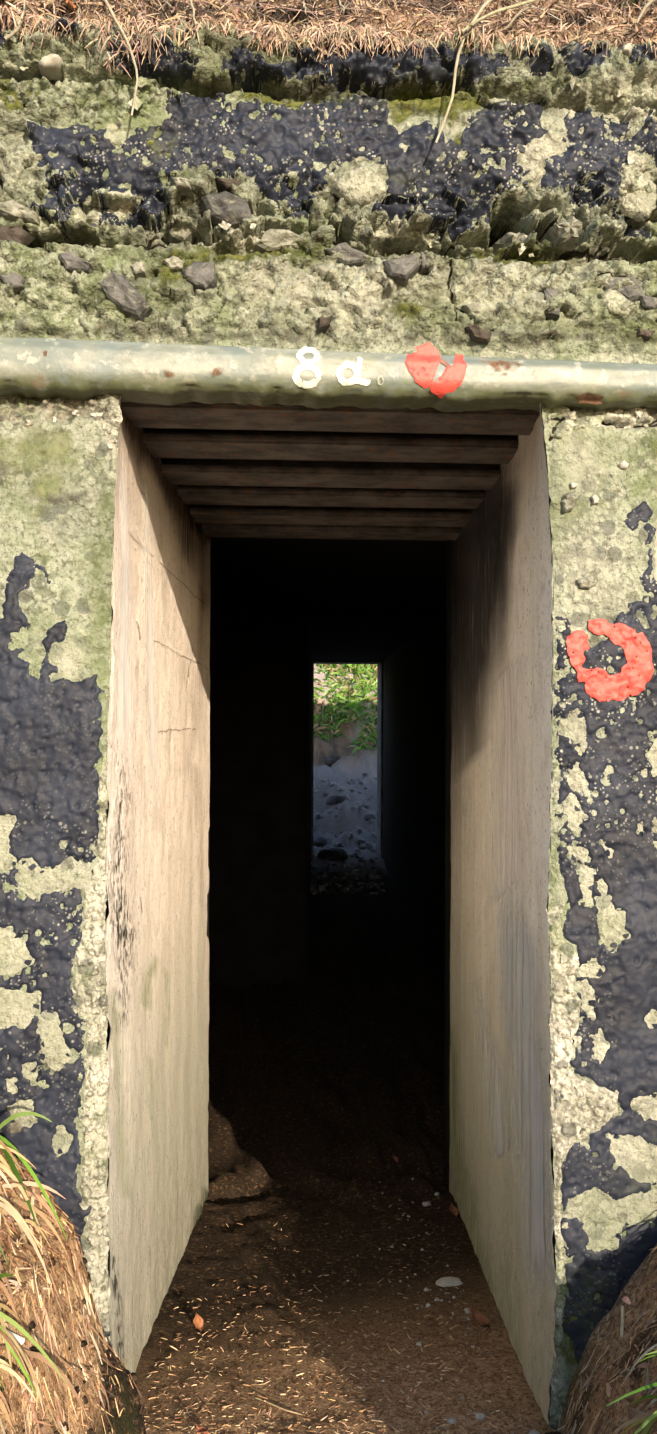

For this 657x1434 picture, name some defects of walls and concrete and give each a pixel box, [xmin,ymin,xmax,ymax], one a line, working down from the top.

crack [388,245,476,323]
crack [559,231,650,290]
spalling [0,752,111,1343]
spalling [547,708,657,1400]